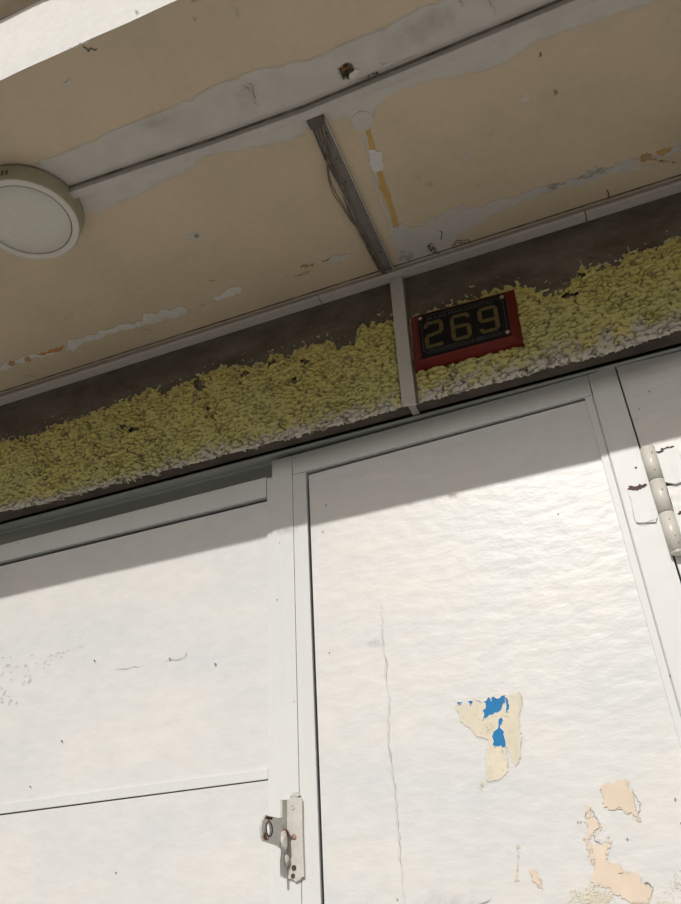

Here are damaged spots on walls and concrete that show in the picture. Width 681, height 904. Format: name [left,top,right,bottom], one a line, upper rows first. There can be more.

flaking render [35,0,556,186]
peeling [351,111,681,264]
peeling [0,306,188,371]
peeling [599,778,641,821]
peeling [566,803,674,904]